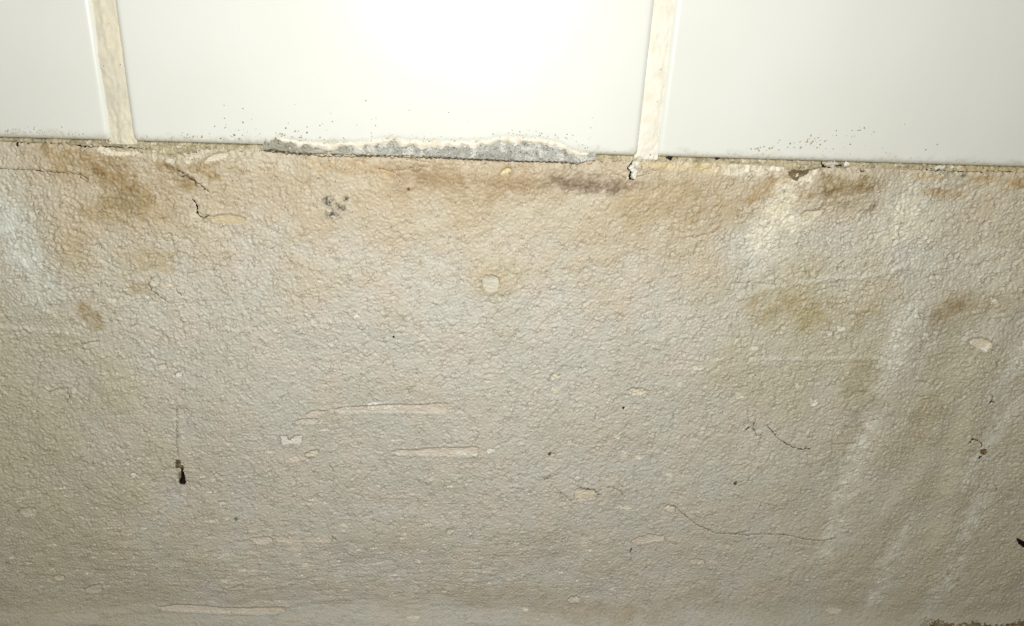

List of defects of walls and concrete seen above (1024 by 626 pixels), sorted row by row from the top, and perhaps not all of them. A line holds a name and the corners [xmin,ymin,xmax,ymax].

spalling [263,137,596,174]
crack [178,170,209,218]
damp [0,126,210,336]
damp [268,126,1024,626]
crack [753,419,852,450]
crack [666,504,837,541]